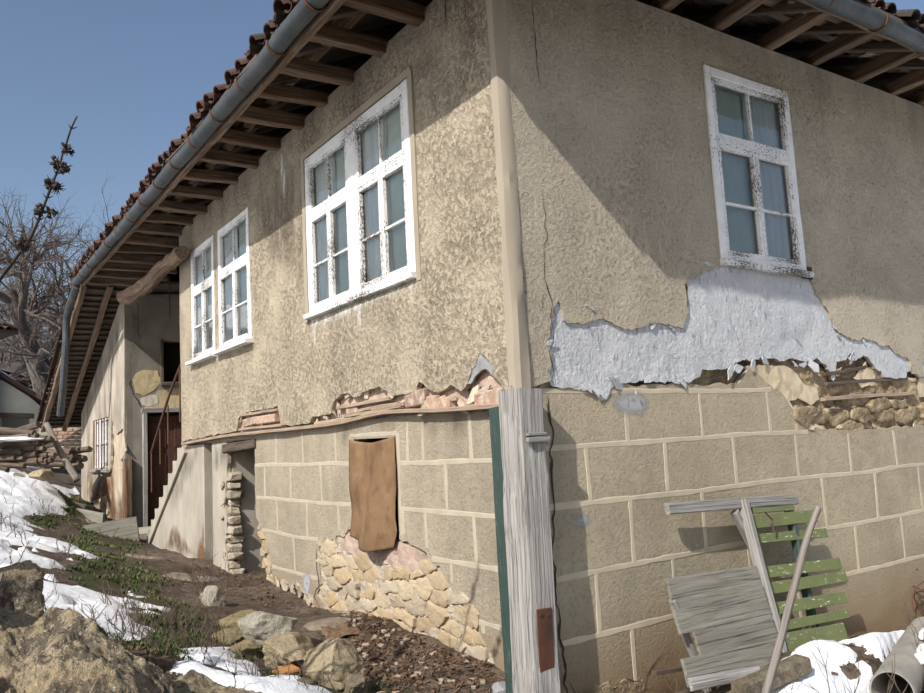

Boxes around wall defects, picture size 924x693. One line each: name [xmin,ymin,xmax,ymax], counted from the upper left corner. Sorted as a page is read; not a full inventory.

crack [532,2,541,86]
crack [542,192,555,377]
flaking render [238,406,290,432]
flaking render [314,354,504,424]
flaking render [547,262,924,434]